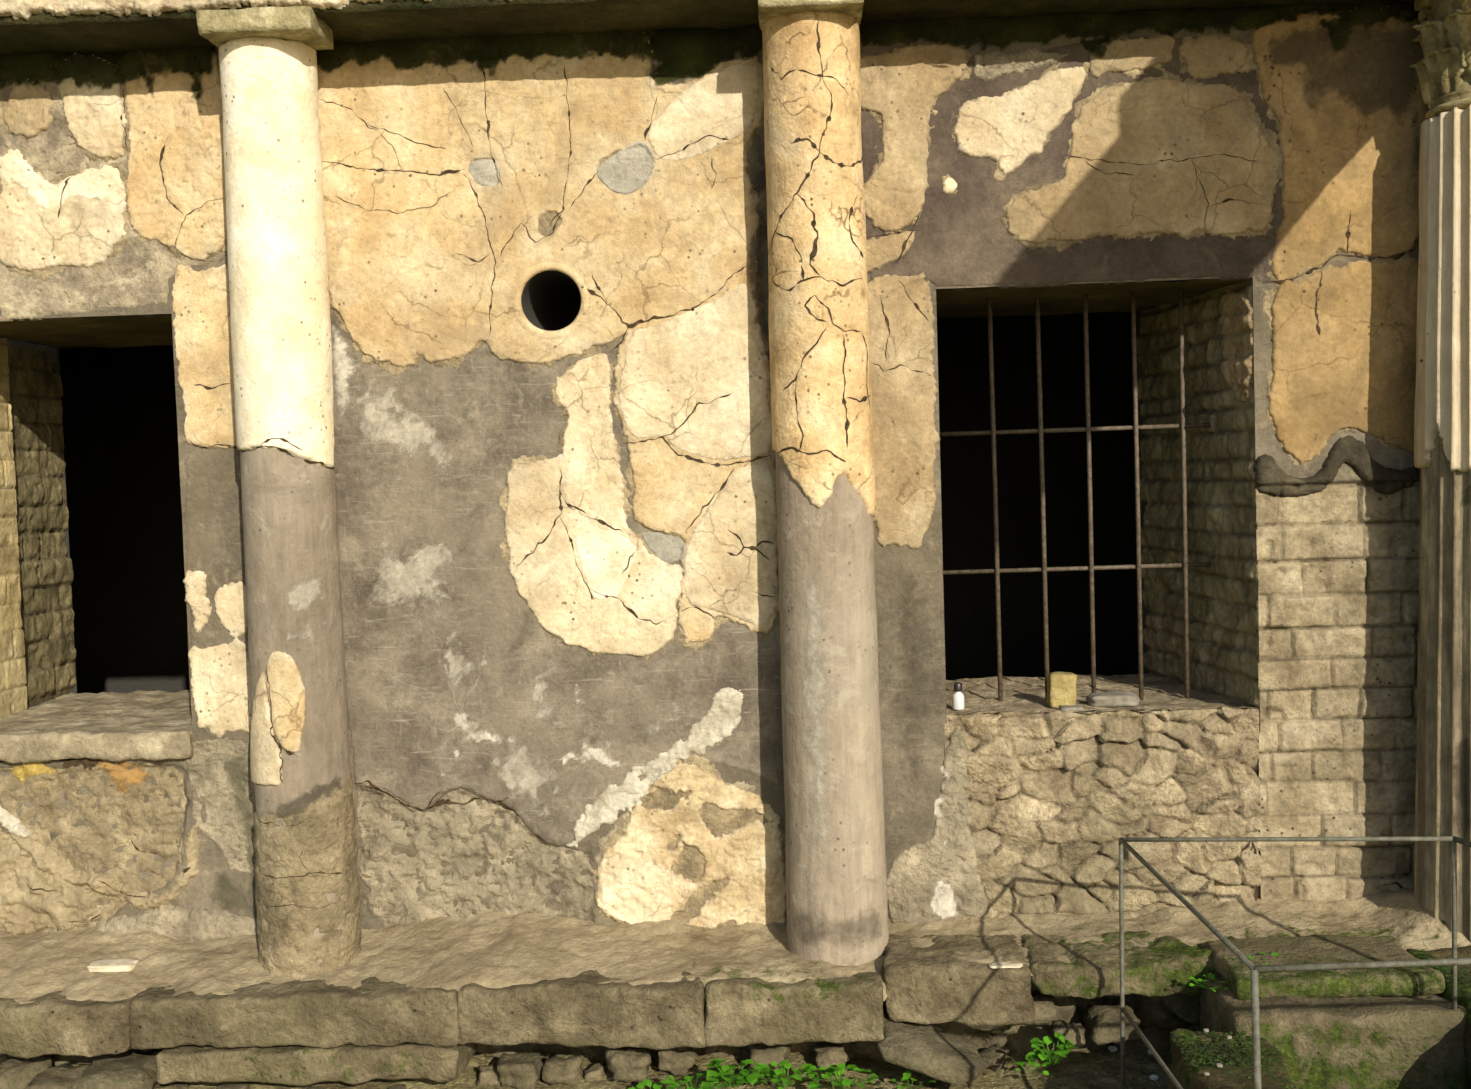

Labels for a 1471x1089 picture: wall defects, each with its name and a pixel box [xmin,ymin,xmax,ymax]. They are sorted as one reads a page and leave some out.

crack [321,65,597,336]
crack [587,19,931,597]
peeling [317,11,1471,650]
crack [1273,211,1416,335]
spalling [0,37,787,979]
crack [516,469,717,625]
crack [355,780,515,812]
spalling [887,727,988,924]